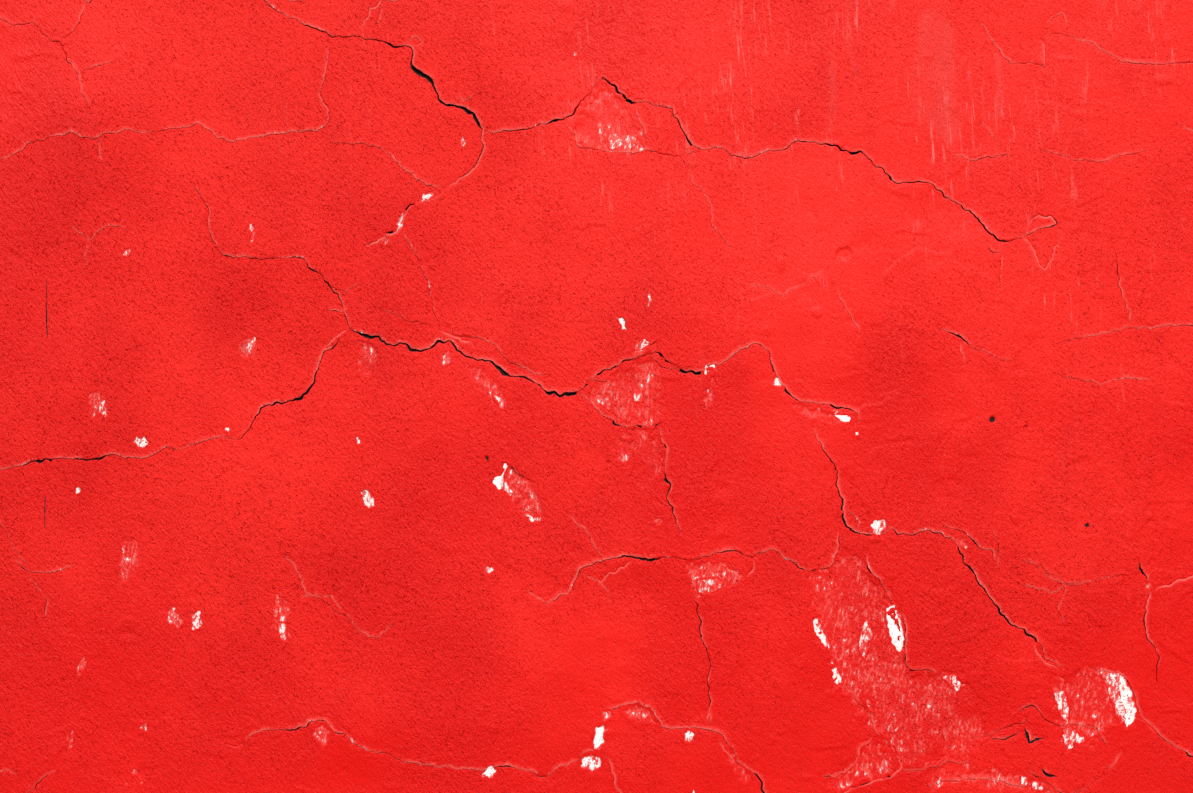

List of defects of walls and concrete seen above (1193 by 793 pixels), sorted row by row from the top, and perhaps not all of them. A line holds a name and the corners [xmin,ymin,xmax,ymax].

crack [974,11,1193,69]
crack [1041,147,1152,166]
crack [0,0,1061,533]
crack [1052,246,1193,388]
crack [0,519,76,620]
crack [280,554,397,641]
peeling [485,456,548,527]
crack [523,423,1193,793]
peeling [868,516,891,536]
crack [220,716,623,793]
peeling [803,544,1057,793]
peeling [1050,663,1144,761]